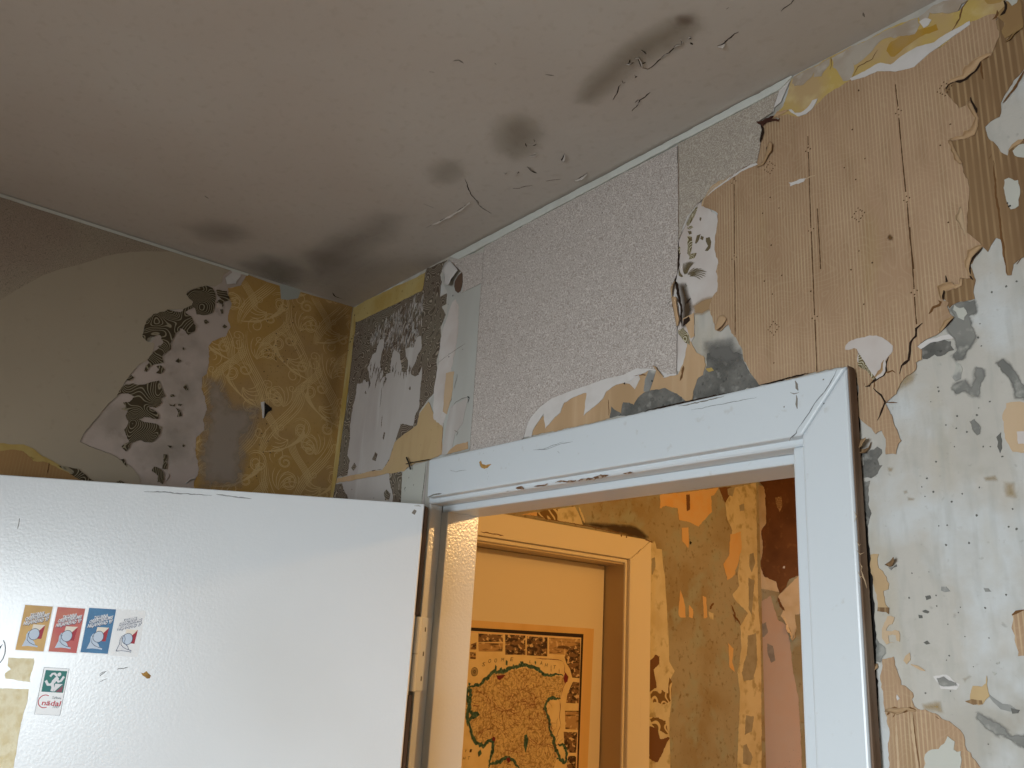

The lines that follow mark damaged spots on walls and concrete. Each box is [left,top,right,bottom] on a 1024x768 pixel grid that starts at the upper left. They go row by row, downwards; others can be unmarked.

crack [613,39,683,111]
crack [426,180,490,228]
flaking render [1004,178,1020,209]
crack [864,247,983,419]
peeling [127,341,184,381]
flaking render [610,342,760,418]
flaking render [918,300,1004,457]
flaking render [997,359,1024,398]
flaking render [862,447,882,526]
peeling [640,655,660,705]
peeling [649,726,669,762]
flaking render [977,713,1024,748]